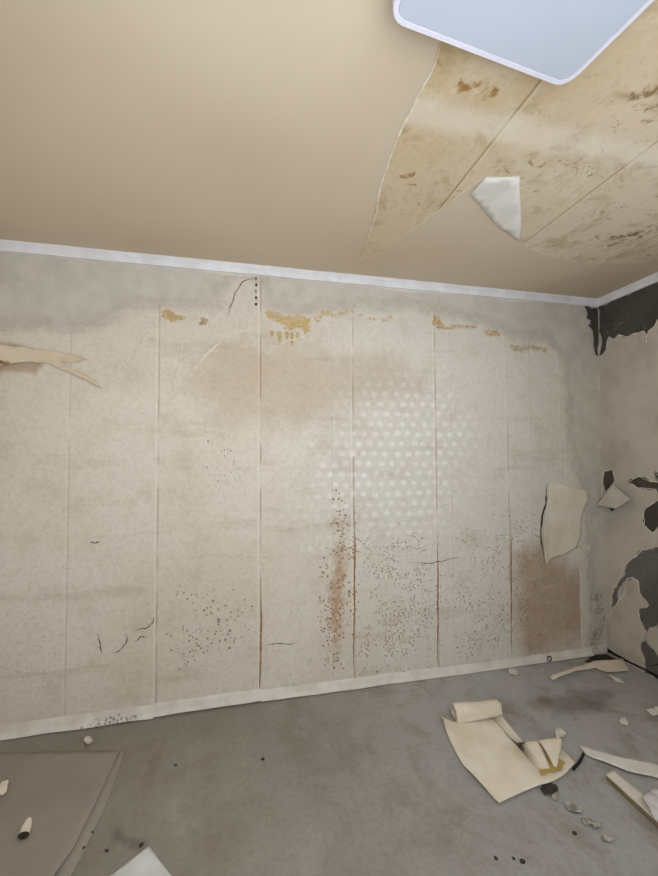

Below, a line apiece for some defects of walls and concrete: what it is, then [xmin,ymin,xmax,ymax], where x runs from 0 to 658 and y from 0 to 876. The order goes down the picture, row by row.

peeling [359,0,658,264]
peeling [0,251,230,337]
crack [228,277,257,314]
water stain [269,312,310,345]
peeling [257,276,658,680]
corrosion [318,490,359,669]